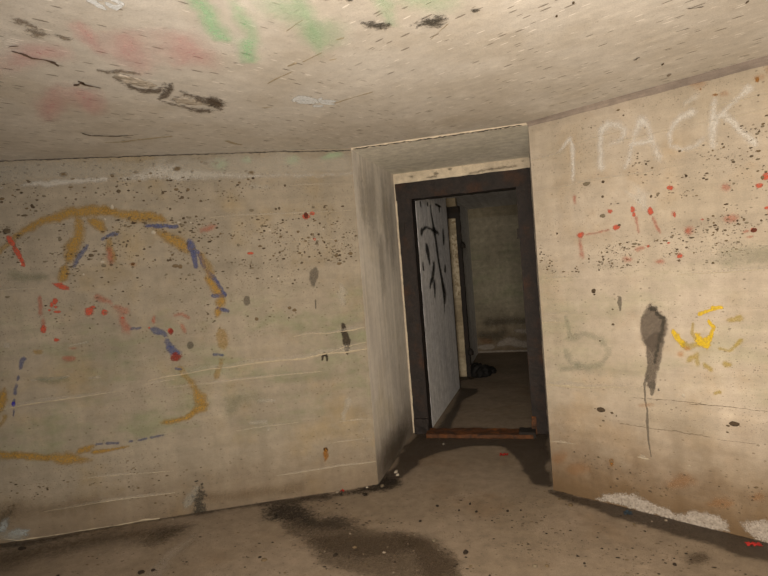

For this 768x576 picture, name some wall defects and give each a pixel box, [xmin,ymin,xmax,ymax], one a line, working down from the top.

spalling [654,203,768,264]
damp [640,304,668,455]
damp [381,376,768,560]